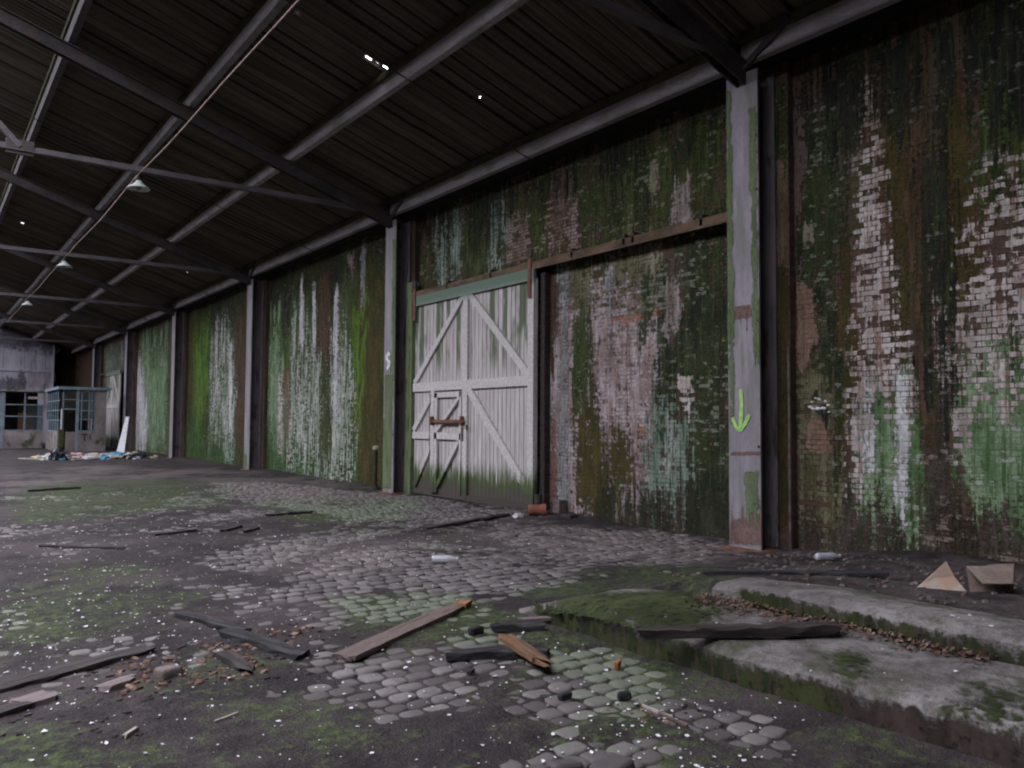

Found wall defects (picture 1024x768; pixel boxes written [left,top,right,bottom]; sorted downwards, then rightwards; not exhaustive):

water stain [419,90,727,285]
spalling [850,75,886,199]
efflorescence [135,347,149,451]
water stain [189,291,245,464]
water stain [269,229,386,482]
peeling [677,374,695,423]
water stain [793,0,1024,565]